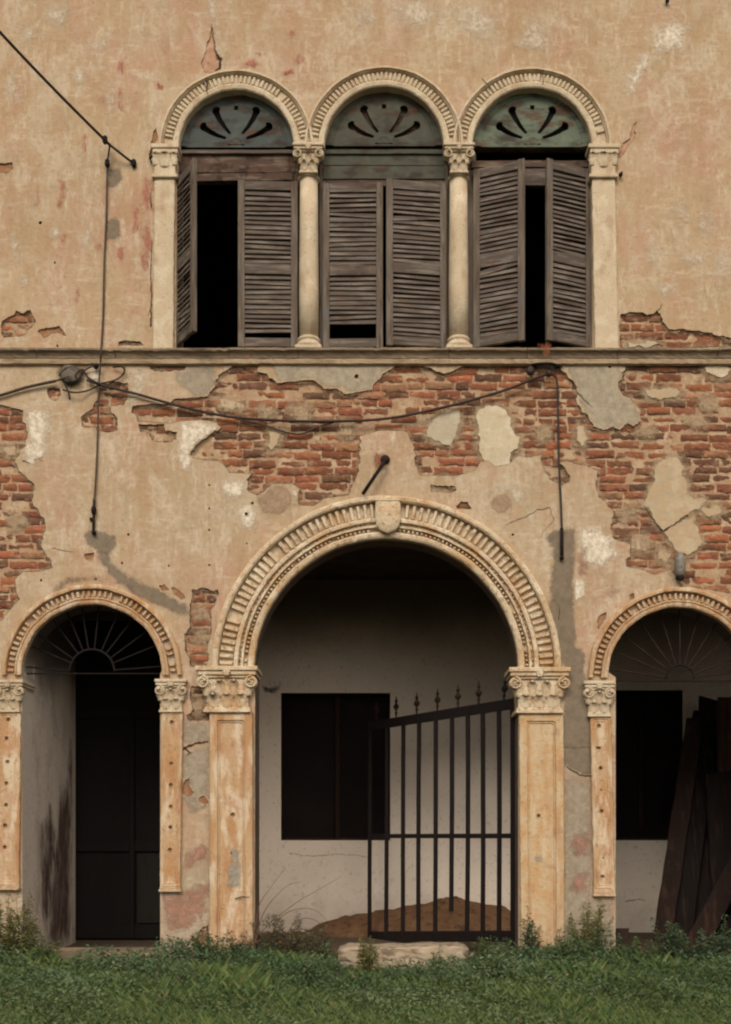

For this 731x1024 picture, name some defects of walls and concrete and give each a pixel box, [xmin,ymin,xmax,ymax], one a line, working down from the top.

spalling [1,310,66,338]
spalling [619,310,731,348]
spalling [0,405,53,620]
spalling [81,366,731,593]
spalling [159,584,219,667]
crack [183,741,208,756]
spalling [182,779,208,806]
leakage [41,791,72,945]